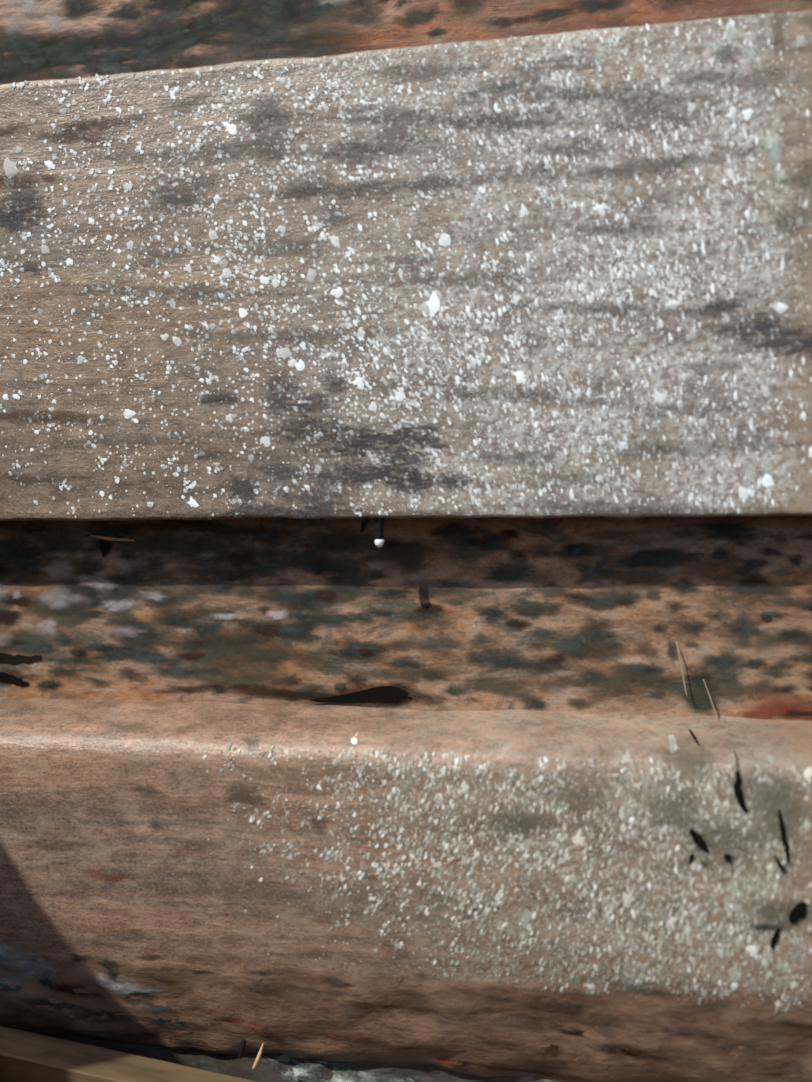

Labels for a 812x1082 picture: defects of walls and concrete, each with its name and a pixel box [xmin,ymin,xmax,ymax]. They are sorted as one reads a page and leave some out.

mould [495,0,619,24]
mould [0,0,445,85]
water stain [41,119,126,142]
water stain [0,174,52,230]
water stain [706,299,812,357]
water stain [0,376,690,708]
mould [653,524,812,710]
crack [733,750,747,812]
crack [689,829,732,865]
crack [774,809,790,872]
crack [750,902,808,949]
water stain [25,979,123,1021]